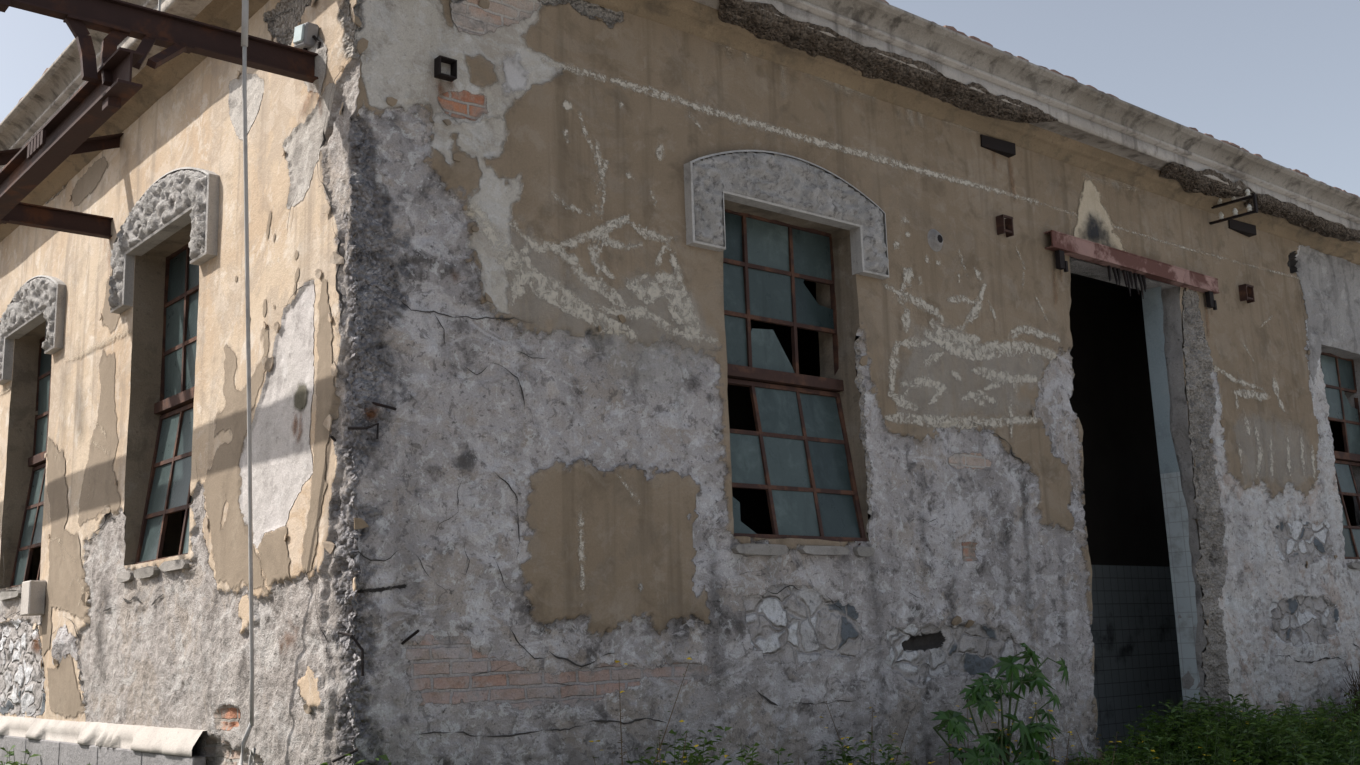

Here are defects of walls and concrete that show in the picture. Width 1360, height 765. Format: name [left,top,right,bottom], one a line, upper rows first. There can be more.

peeling [0,437,91,718]
flaking render [45,0,1099,765]
flaking render [1206,287,1360,730]
spalling [1287,245,1303,273]